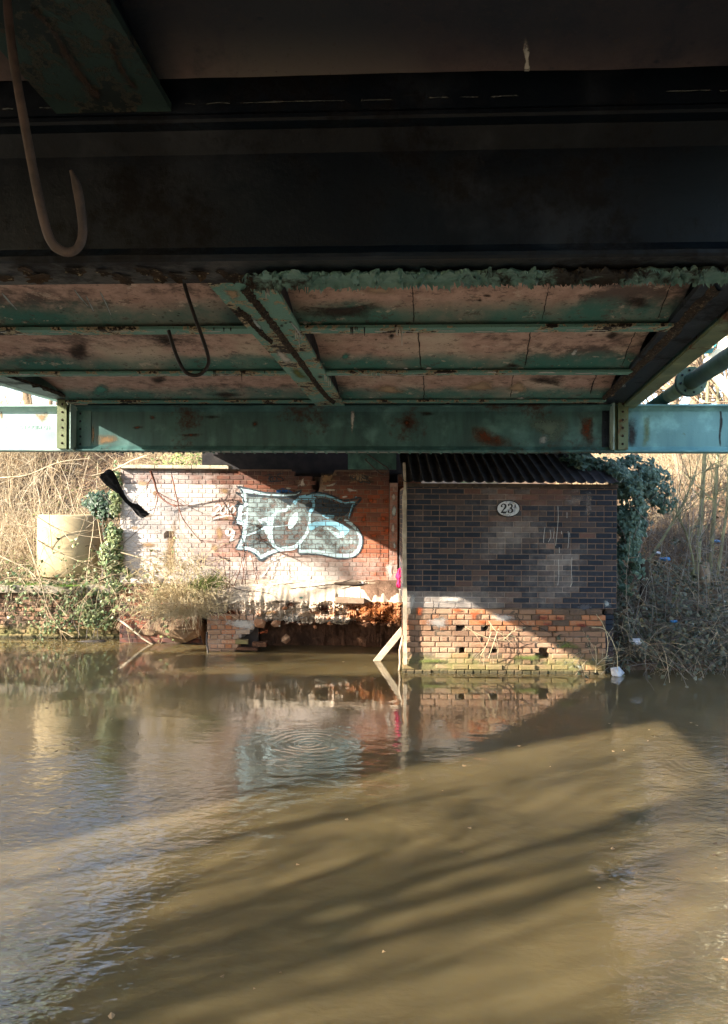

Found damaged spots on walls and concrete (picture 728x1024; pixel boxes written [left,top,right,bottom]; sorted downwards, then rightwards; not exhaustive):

rust [0,266,53,284]
rust [64,268,335,405]